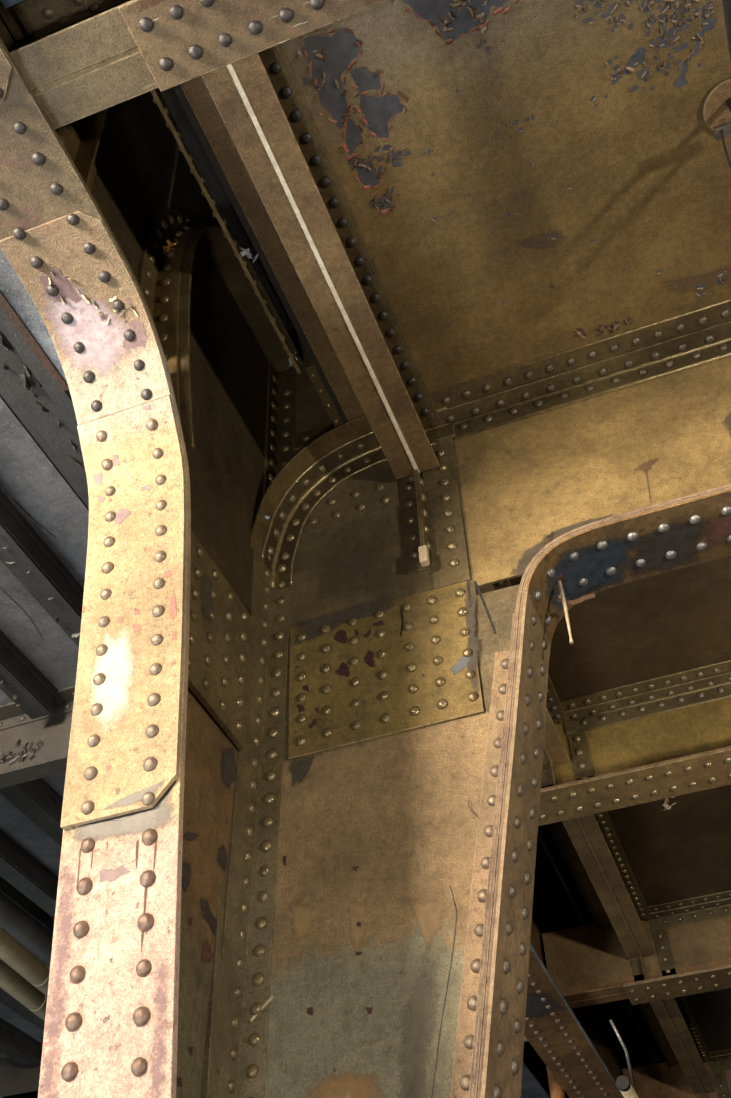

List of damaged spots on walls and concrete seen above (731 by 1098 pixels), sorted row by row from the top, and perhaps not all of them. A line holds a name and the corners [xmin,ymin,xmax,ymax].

peeling [392,0,517,55]
peeling [573,0,718,108]
peeling [297,27,433,214]
peeling [40,267,147,376]
leakage [638,458,659,472]